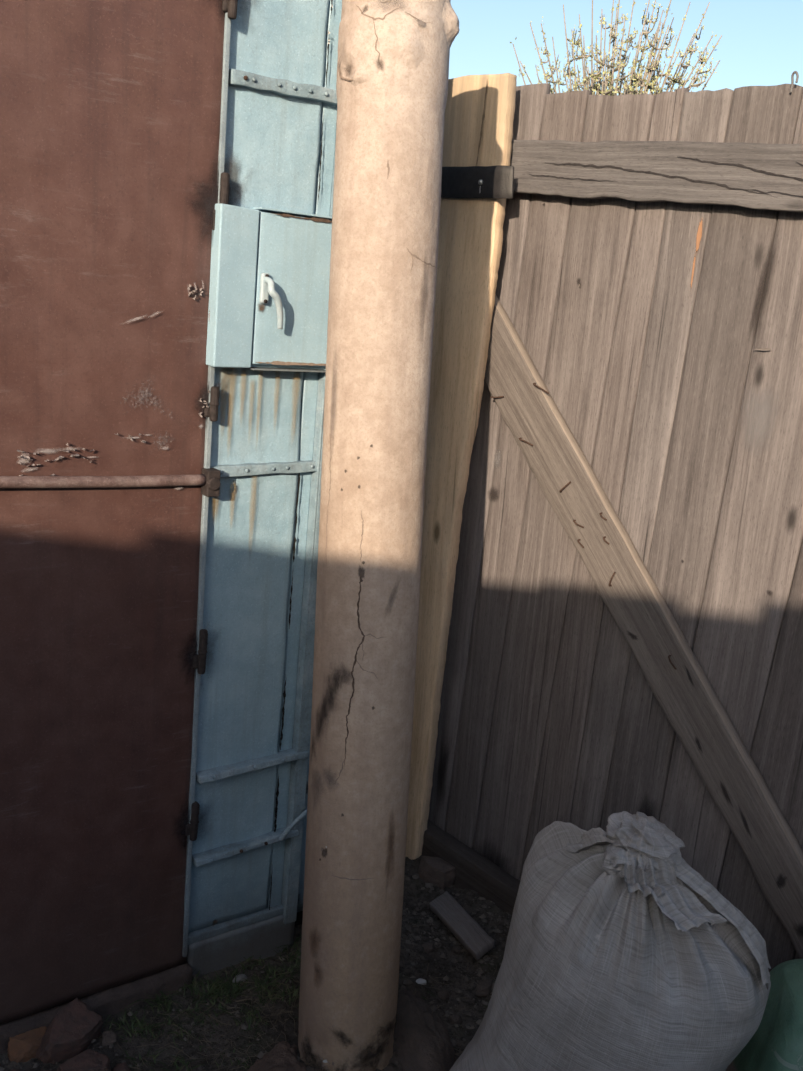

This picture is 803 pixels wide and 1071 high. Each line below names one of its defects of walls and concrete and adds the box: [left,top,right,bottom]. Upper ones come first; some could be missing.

peeling [17,443,96,476]
crack [334,511,383,784]